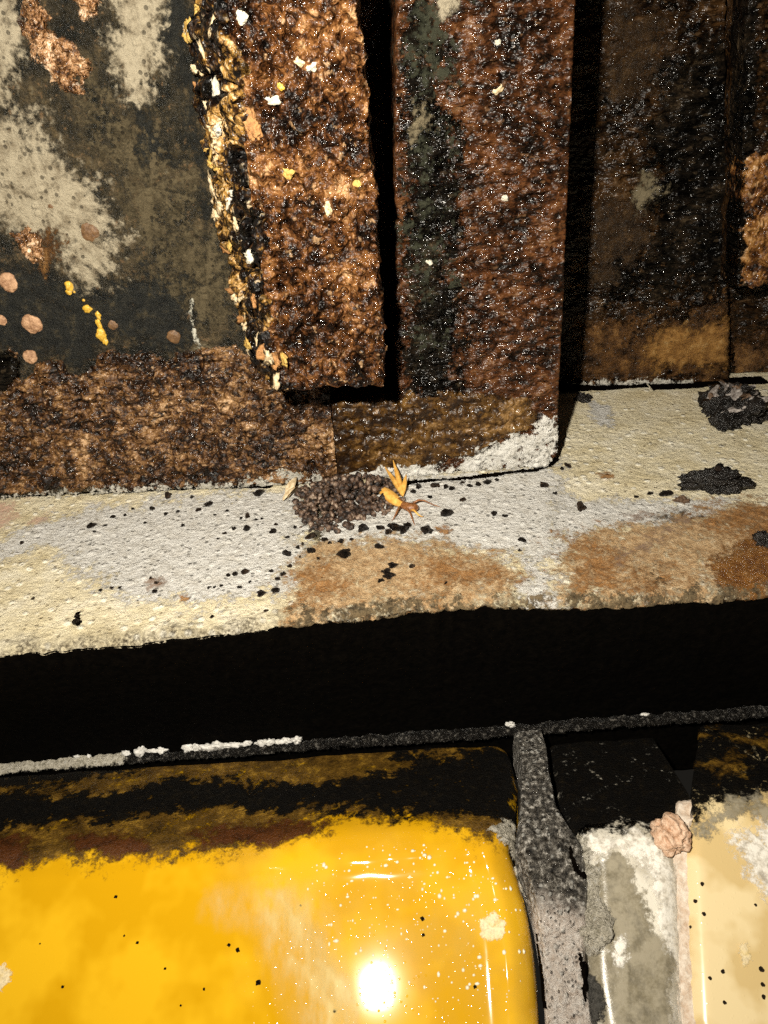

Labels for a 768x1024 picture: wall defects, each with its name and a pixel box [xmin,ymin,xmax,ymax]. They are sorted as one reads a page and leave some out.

rust [22,350,38,364]
damp [0,252,205,368]
damp [122,0,210,240]
rust [181,0,538,475]
damp [570,376,694,386]
rust [569,152,768,385]
damp [573,0,766,316]
rust [278,493,768,627]
damp [0,736,303,792]
damp [586,852,676,1024]